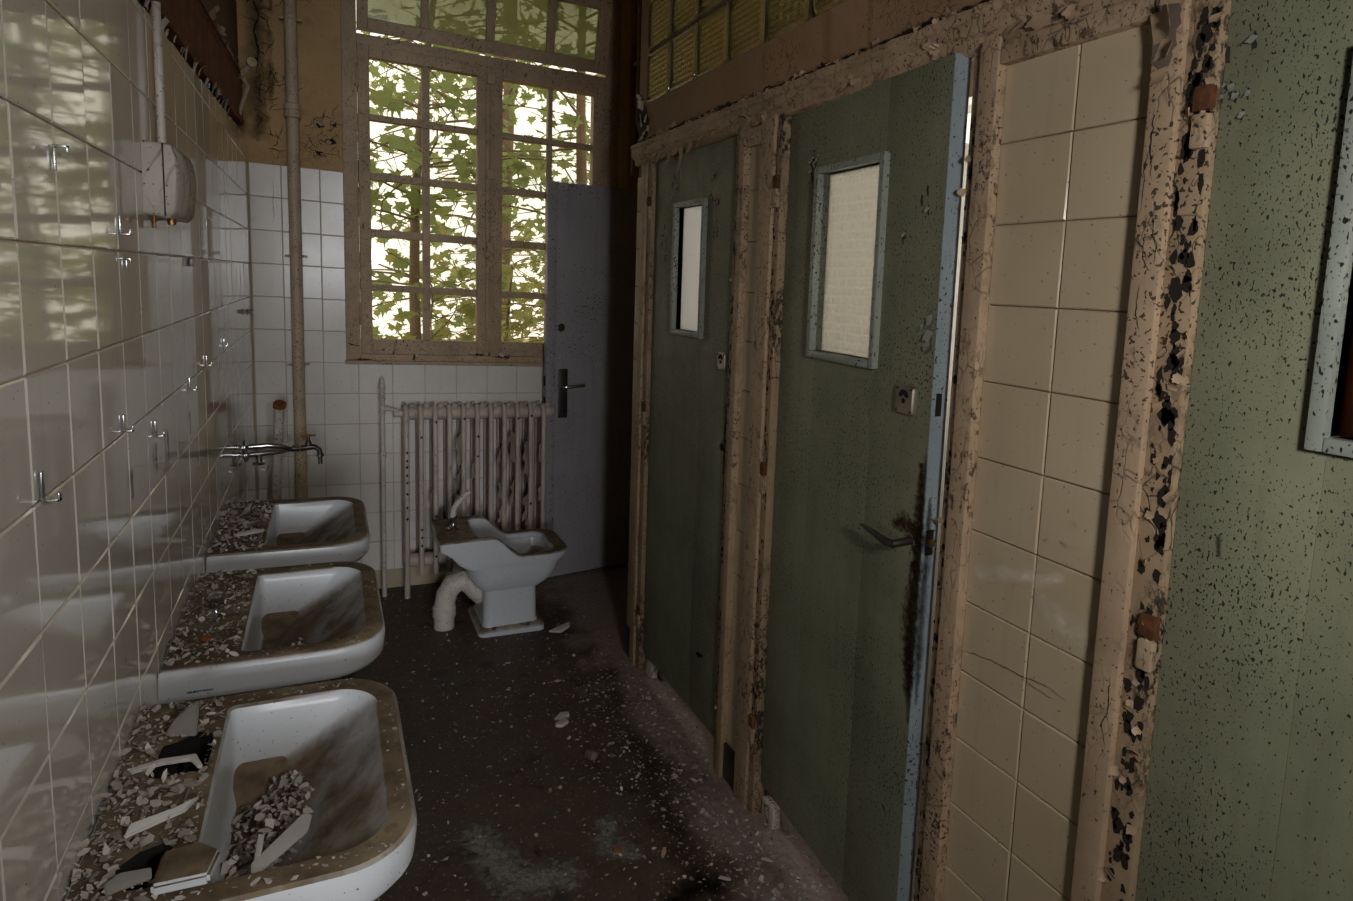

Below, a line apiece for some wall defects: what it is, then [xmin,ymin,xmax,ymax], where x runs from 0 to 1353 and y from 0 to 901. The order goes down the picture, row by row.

crack [241,0,342,211]
peeling [636,0,990,211]
peeling [761,208,779,463]
peeling [1137,0,1257,584]
leakage [907,464,931,722]
peeling [930,602,941,697]
peeling [936,450,951,586]
peeling [1130,600,1153,637]
peeling [1098,655,1150,901]